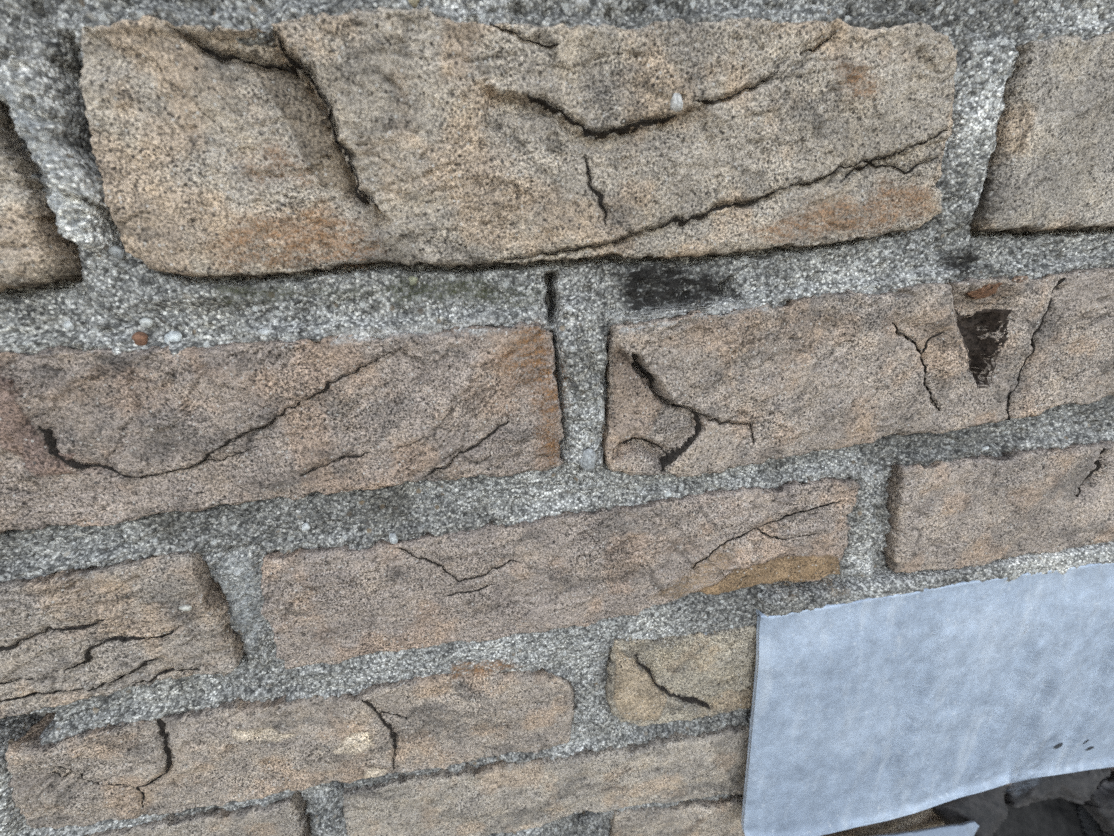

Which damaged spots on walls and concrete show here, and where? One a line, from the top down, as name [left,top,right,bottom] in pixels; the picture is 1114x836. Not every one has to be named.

crack [489,22,560,48]
crack [167,25,380,210]
crack [500,33,944,260]
peeling [965,276,1029,299]
crack [892,322,944,411]
crack [1006,277,1066,420]
crack [38,351,392,478]
crack [612,354,754,472]
crack [396,547,519,597]
crack [0,619,200,702]
crack [634,654,711,710]